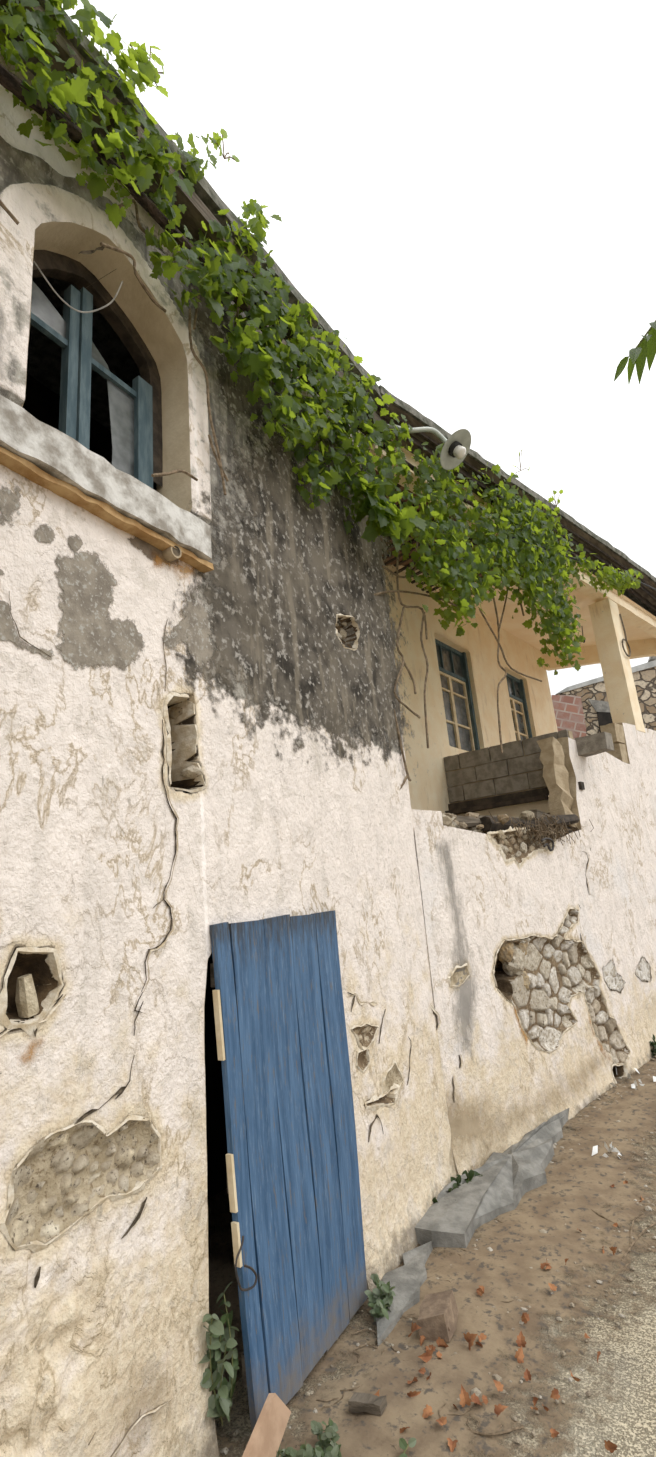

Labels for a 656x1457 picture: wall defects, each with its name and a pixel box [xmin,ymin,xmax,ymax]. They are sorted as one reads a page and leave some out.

peeling [0,486,21,526]
peeling [128,537,179,567]
peeling [0,524,145,671]
peeling [163,597,217,668]
spalling [335,614,360,651]
spalling [164,692,207,793]
crack [115,621,179,1099]
spalling [0,947,64,1036]
spalling [447,963,470,988]
spalling [493,907,652,1084]
spalling [0,1114,162,1253]